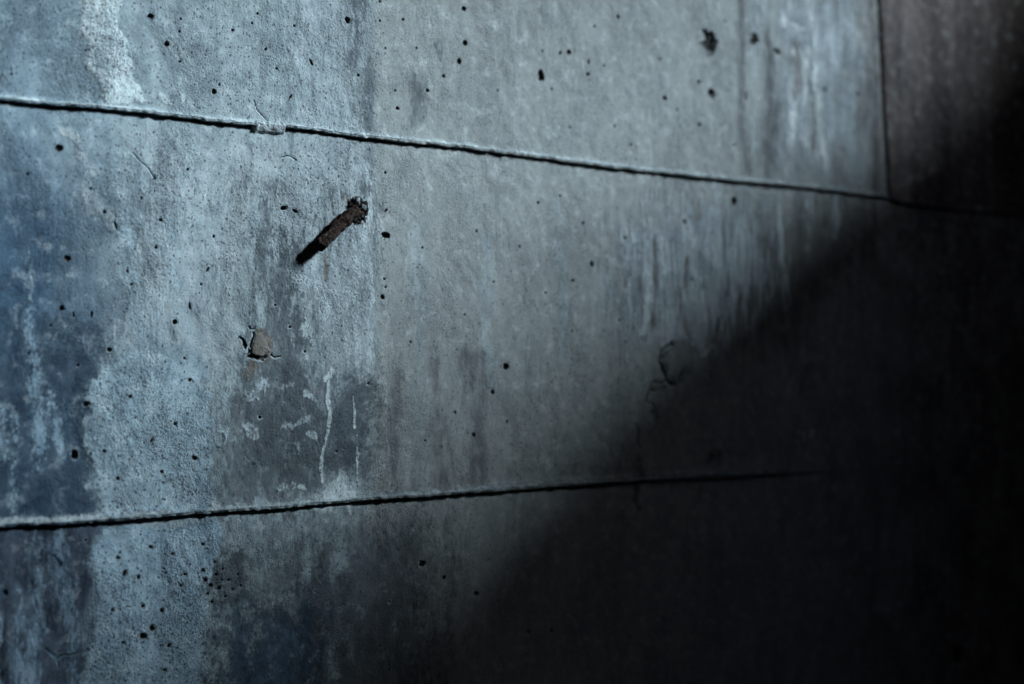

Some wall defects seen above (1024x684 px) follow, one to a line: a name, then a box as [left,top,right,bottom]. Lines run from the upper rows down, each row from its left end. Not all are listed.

water stain [0,95,254,123]
corrosion [314,199,369,252]
spalling [239,326,280,362]
water stain [109,0,885,684]
water stain [0,247,114,684]